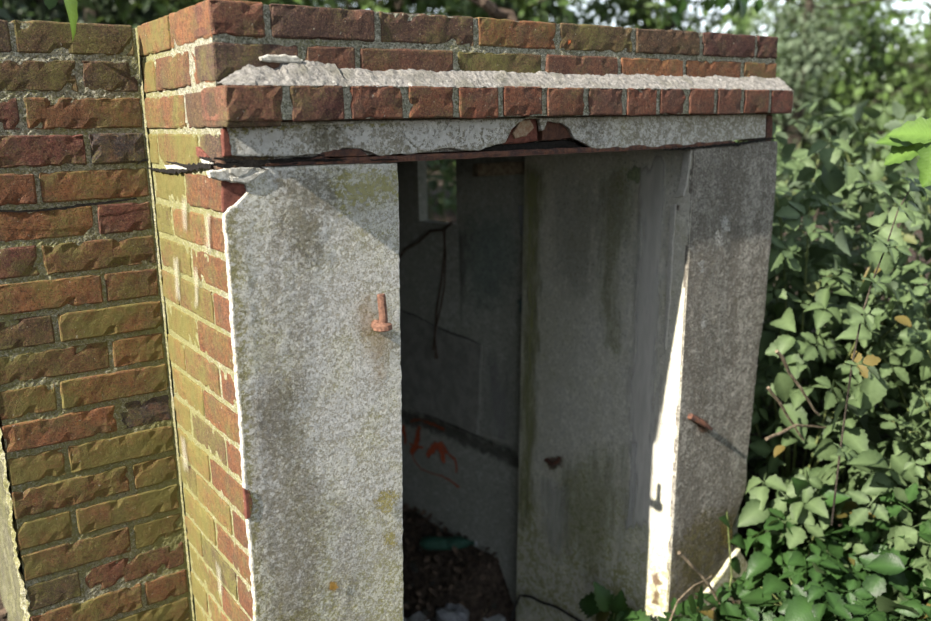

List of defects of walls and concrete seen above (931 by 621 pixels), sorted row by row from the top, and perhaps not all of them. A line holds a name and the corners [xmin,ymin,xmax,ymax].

spalling [404,119,581,152]
crack [136,154,346,177]
rust [310,149,369,159]
crack [0,198,137,213]